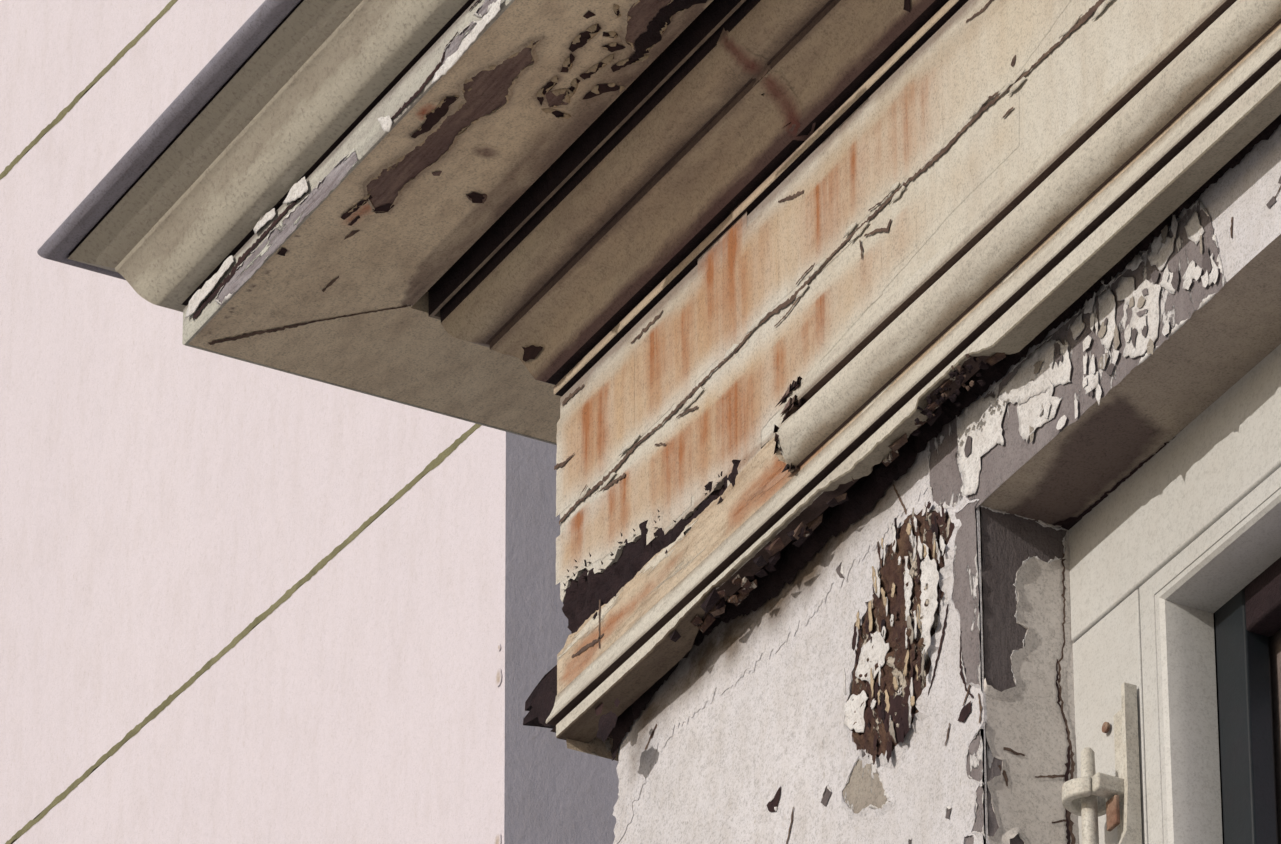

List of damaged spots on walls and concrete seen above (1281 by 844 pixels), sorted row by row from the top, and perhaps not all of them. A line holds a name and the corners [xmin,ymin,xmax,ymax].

peeling [362,36,545,213]
peeling [431,0,501,84]
peeling [536,0,685,119]
peeling [185,148,357,318]
peeling [631,310,663,343]
rust [556,0,1071,585]
crack [554,0,1112,525]
peeling [821,200,1226,821]
damp [1000,387,1178,526]
crack [928,604,982,746]
crack [998,436,1176,844]